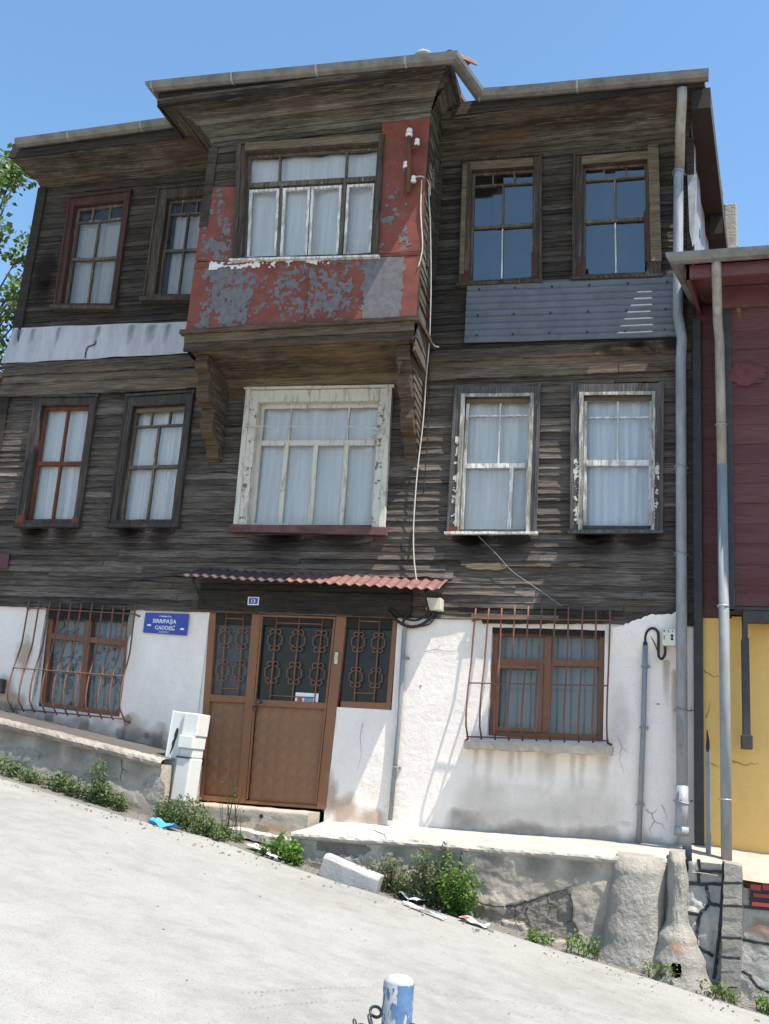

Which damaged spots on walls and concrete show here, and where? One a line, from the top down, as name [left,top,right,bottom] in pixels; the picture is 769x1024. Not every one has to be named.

peeling [194,160,415,328]
crack [459,852,580,939]